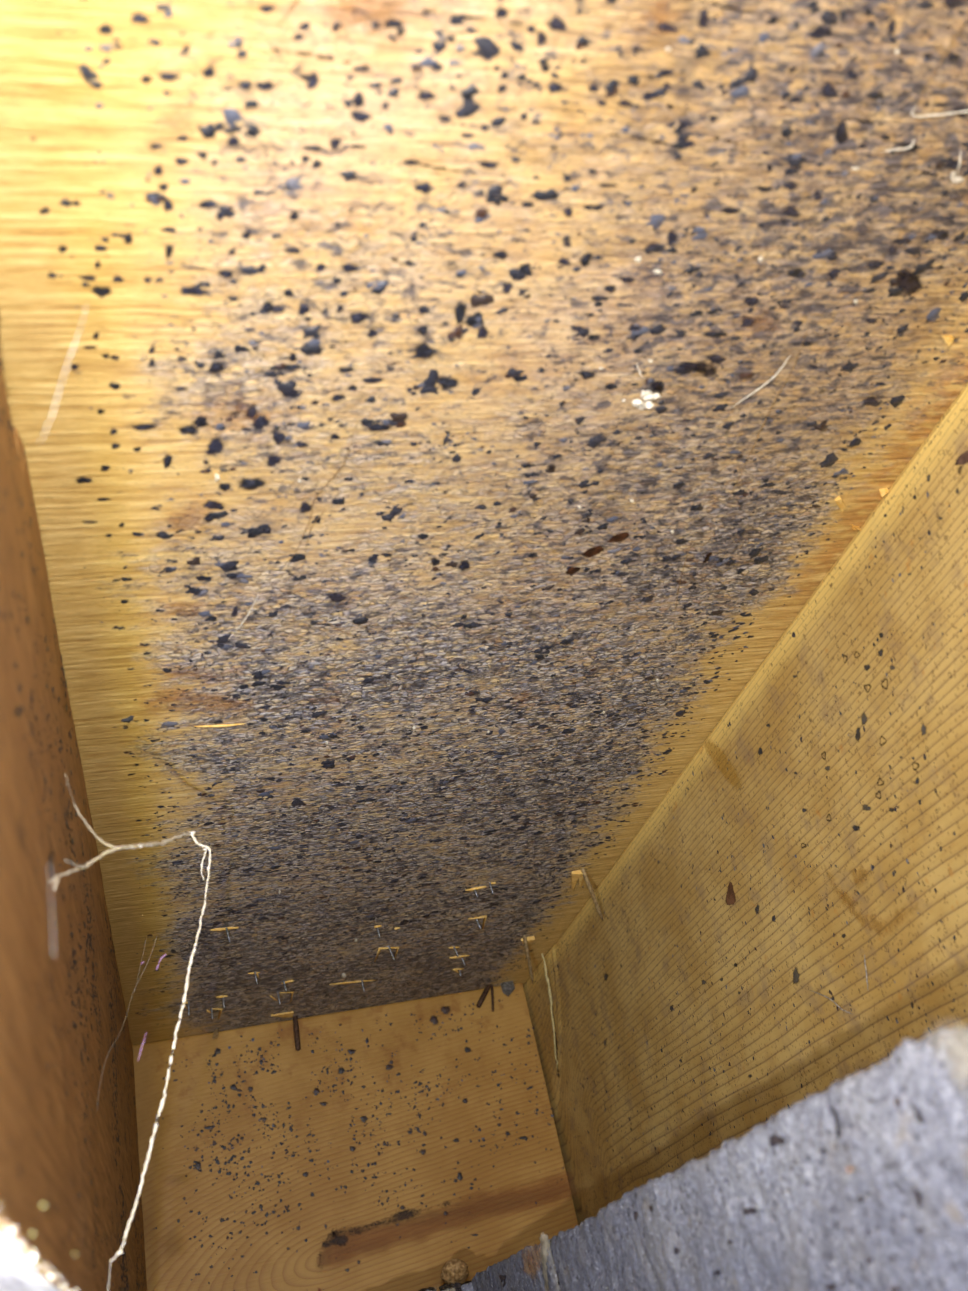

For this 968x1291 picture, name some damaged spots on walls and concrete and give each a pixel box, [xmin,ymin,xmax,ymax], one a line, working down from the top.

mould [132,3,174,23]
mould [78,24,124,109]
mould [141,73,180,96]
water stain [176,80,282,169]
water stain [253,0,645,234]
water stain [586,0,968,288]
water stain [130,165,191,283]
mould [199,200,244,221]
mould [552,233,604,279]
mould [161,264,267,297]
mould [110,424,157,452]
water stain [76,465,133,484]